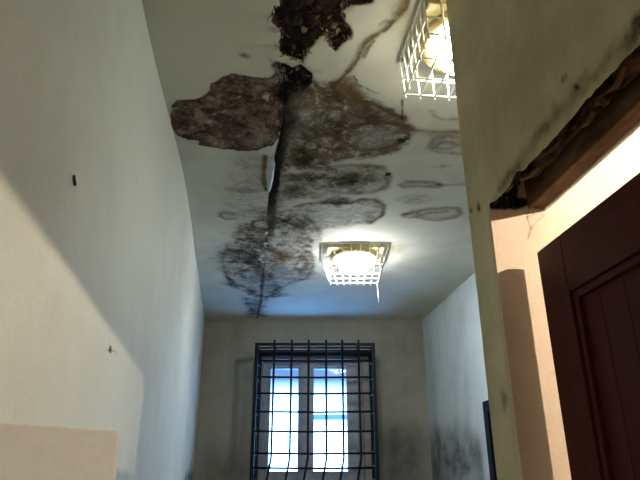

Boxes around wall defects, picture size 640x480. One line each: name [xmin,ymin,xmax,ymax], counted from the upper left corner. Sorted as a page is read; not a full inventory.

spalling [267,0,373,65]
spalling [170,70,283,192]
crack [250,62,313,318]
leakage [219,80,413,317]
leakage [432,440,480,480]